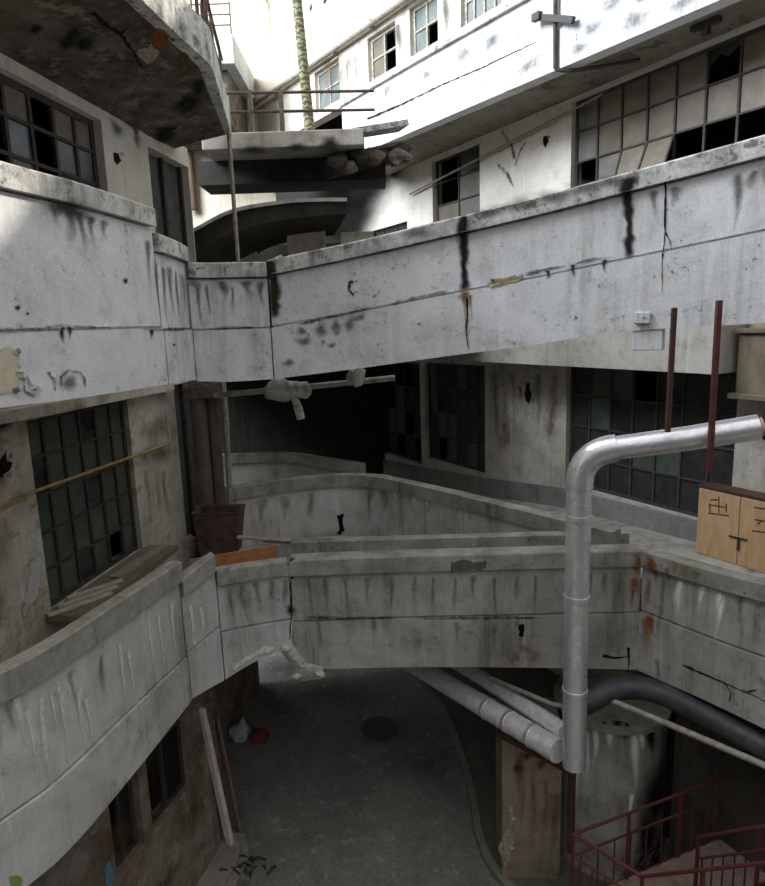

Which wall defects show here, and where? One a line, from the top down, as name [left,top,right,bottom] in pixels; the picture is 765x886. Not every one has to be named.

crack [89,12,143,69]
water stain [457,216,469,290]
water stain [511,199,529,208]
water stain [575,177,636,256]
crack [661,182,672,284]
water stain [735,171,757,203]
water stain [243,261,280,316]
peeling [0,348,25,395]
spalling [0,452,14,478]
water stain [675,565,706,612]
water stain [576,721,654,795]